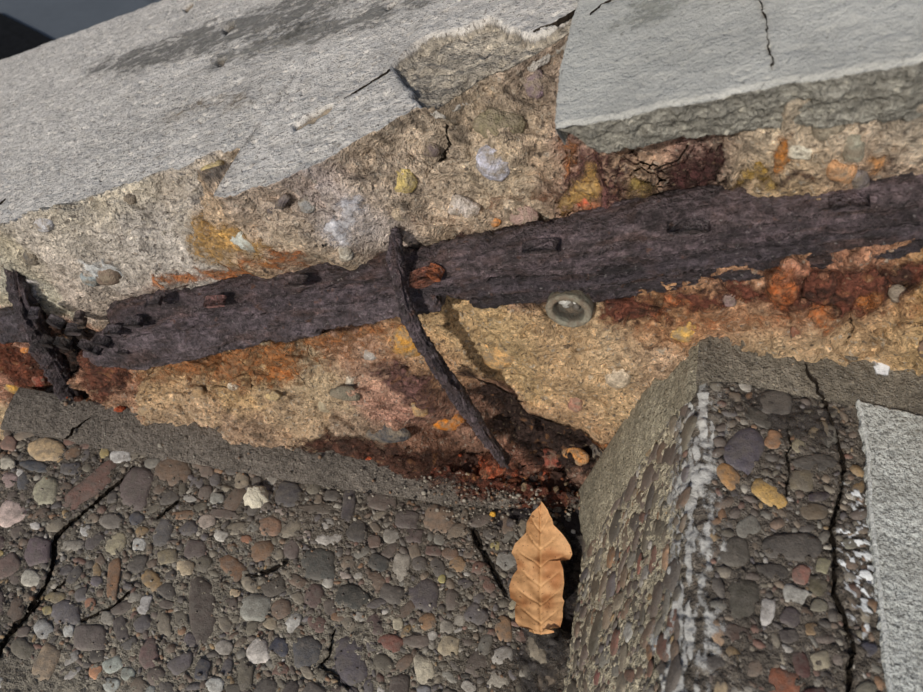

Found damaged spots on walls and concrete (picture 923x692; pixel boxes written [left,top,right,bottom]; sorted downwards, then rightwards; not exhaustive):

spalling [0,342,52,441]
crack [0,465,134,656]
rust [0,213,447,415]
crack [344,69,391,99]
rust [299,365,608,510]
spalling [0,19,923,335]
spalling [66,239,923,487]
crack [533,0,612,32]
rust [403,136,923,333]
leakage [651,384,726,692]
leakage [732,394,843,444]
crack [804,364,856,692]